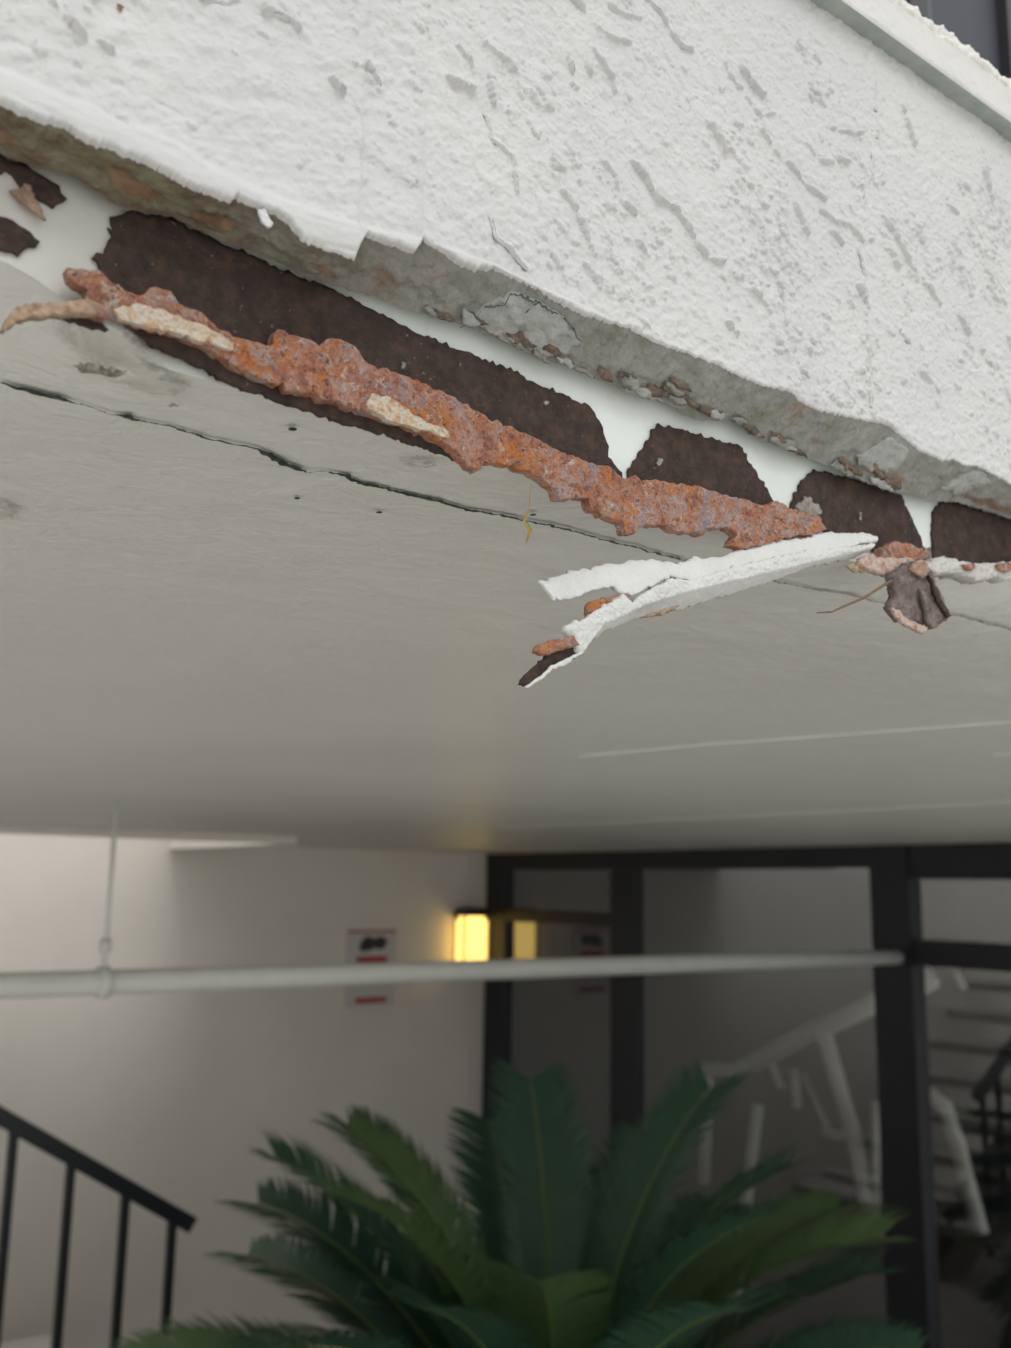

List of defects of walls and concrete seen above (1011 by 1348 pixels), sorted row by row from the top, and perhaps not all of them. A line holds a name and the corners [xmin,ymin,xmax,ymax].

peeling [9,183,46,221]
flaking render [257,208,273,229]
peeling [73,362,128,378]
corrosion [0,210,1011,563]
spalling [422,290,808,458]
crack [0,382,687,561]
spalling [829,437,910,492]
spalling [940,470,990,495]
peeling [926,556,1011,585]
flaking render [518,531,878,688]
crack [772,580,884,603]